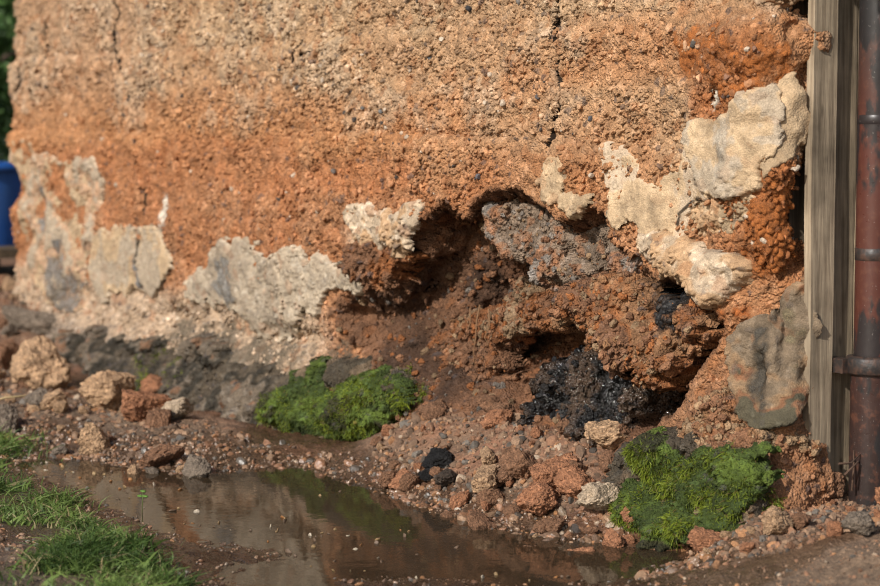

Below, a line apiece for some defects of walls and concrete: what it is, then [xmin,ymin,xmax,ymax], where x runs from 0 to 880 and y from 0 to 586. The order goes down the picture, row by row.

crack [112,1,126,80]
crack [545,0,563,153]
flaking render [7,136,174,314]
spalling [183,71,823,431]
spalling [615,379,694,452]